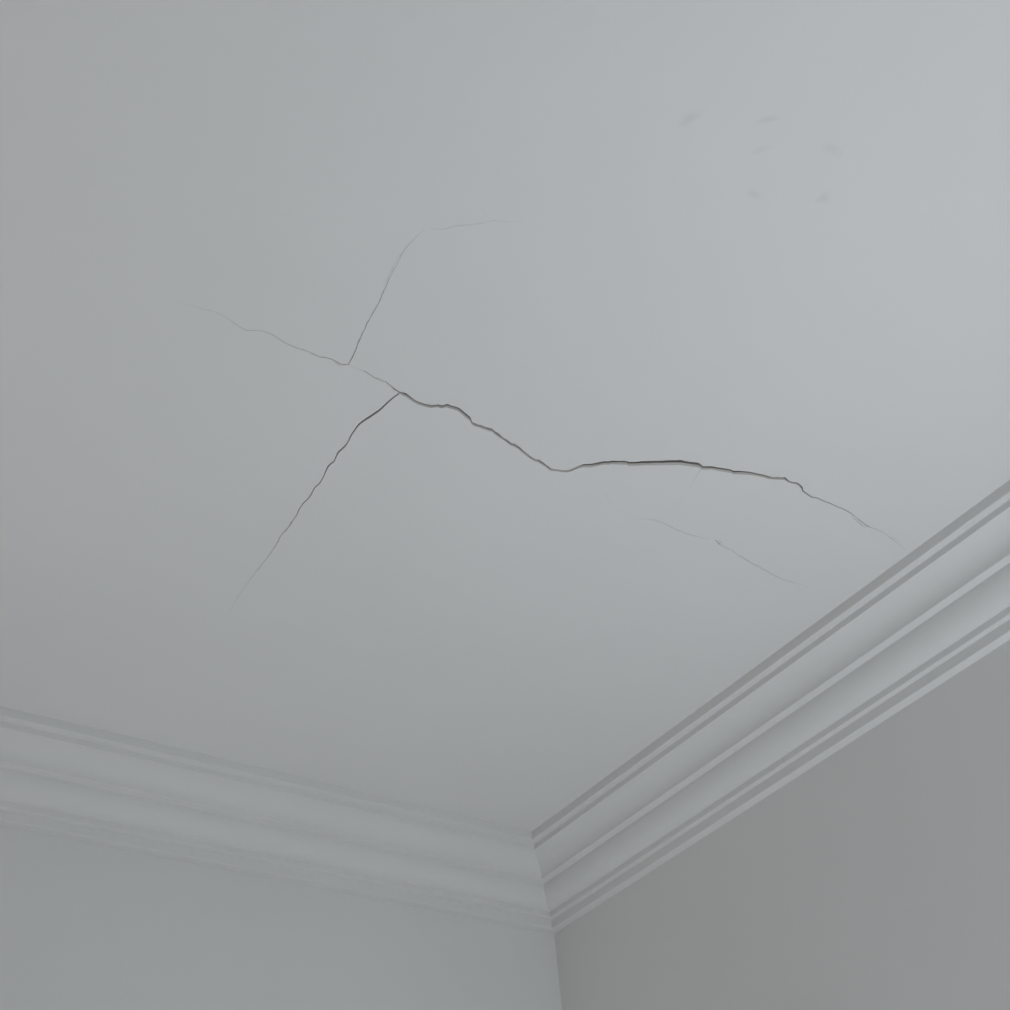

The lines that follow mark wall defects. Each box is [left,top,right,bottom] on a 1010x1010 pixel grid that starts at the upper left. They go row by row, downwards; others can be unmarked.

crack [284,378,868,532]